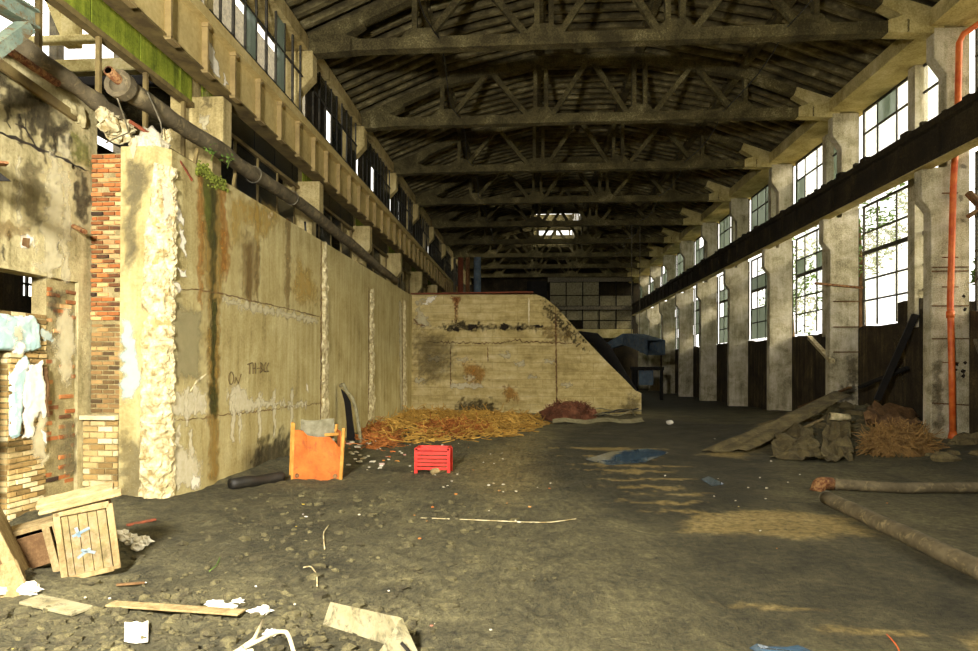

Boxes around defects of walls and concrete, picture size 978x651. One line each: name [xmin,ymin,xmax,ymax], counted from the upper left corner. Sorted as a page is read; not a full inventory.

peeling [0,309,75,465]
damp [0,73,91,280]
spalling [138,162,187,499]
damp [168,173,307,491]